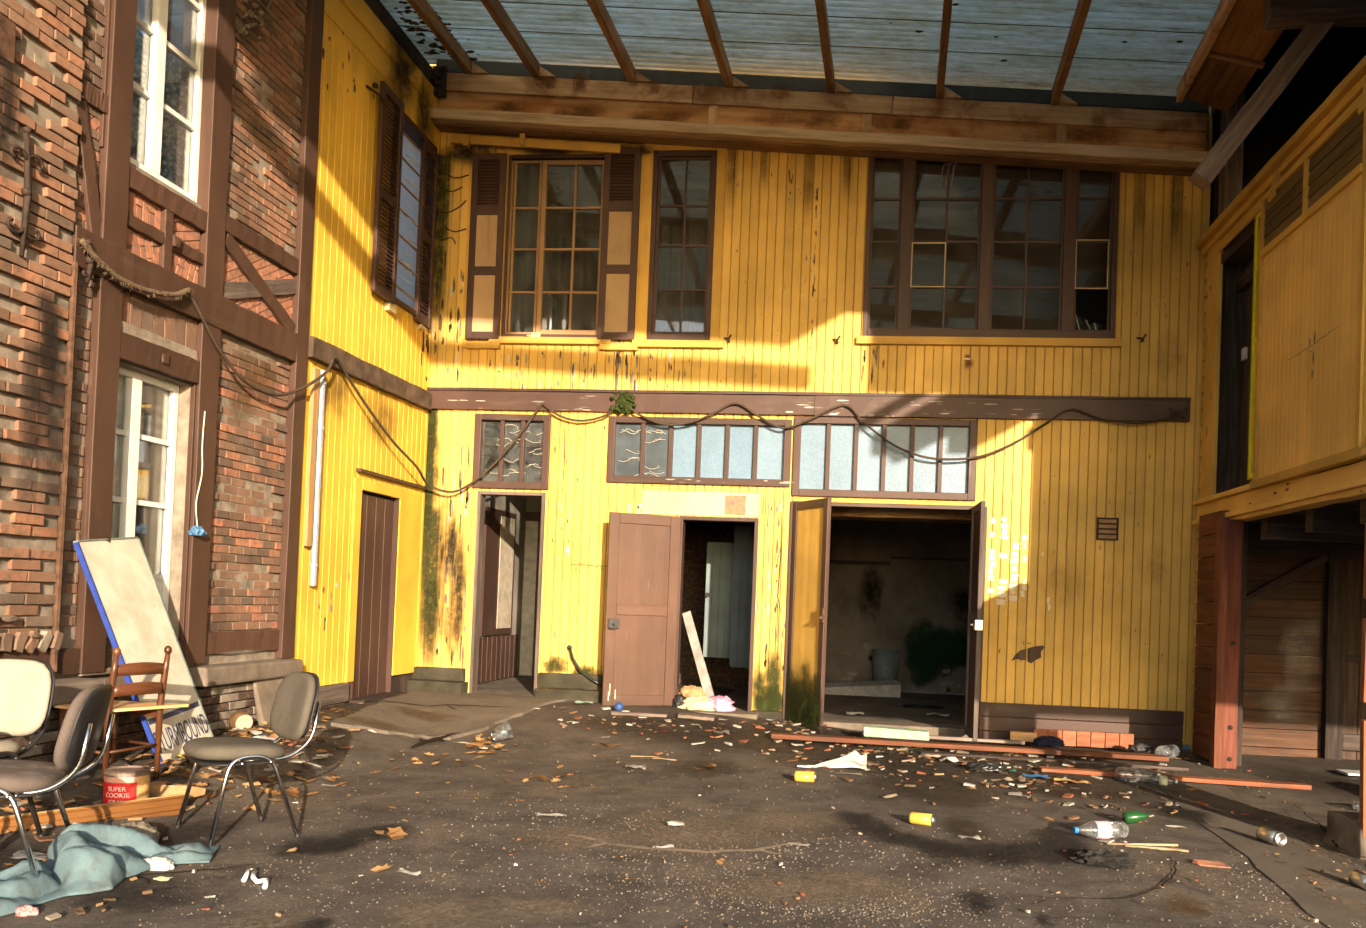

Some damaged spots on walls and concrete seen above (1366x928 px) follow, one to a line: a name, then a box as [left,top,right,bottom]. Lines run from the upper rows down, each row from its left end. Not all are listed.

peeling [805,188,825,301]
peeling [420,247,464,383]
peeling [489,340,690,410]
water stain [447,519,465,637]
peeling [999,641,1044,663]